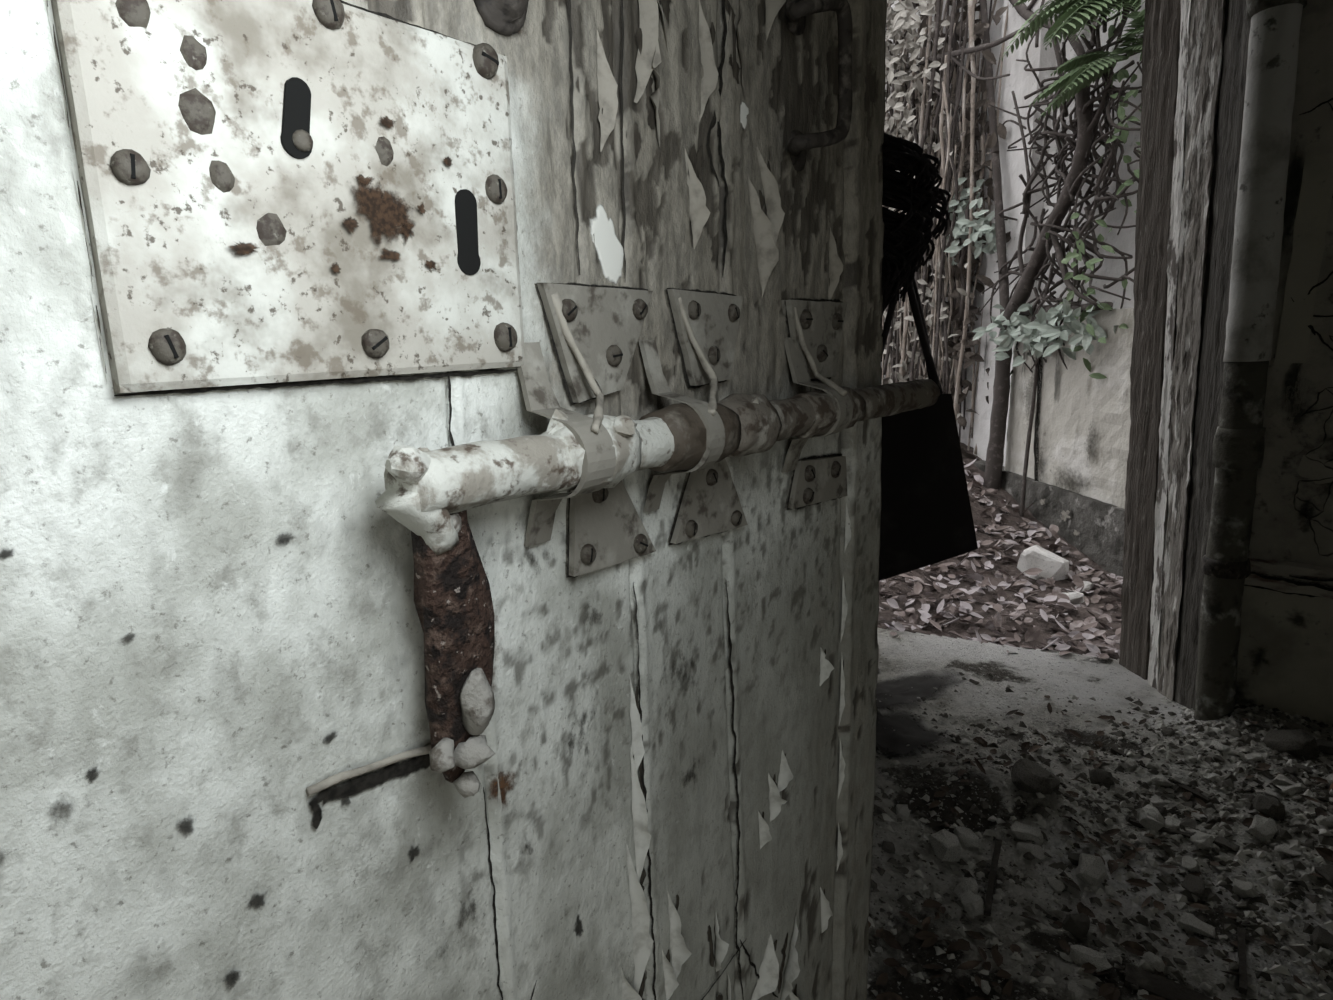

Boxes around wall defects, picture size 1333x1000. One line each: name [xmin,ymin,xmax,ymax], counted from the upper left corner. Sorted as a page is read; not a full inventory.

corrosion [380,116,396,128]
peeling [576,0,671,158]
peeling [698,0,749,129]
corrosion [229,242,259,256]
corrosion [343,175,426,261]
peeling [591,205,624,283]
peeling [685,144,710,249]
peeling [747,147,785,297]
crack [1291,271,1333,351]
crack [1244,387,1333,597]
peeling [621,675,692,1000]
peeling [751,918,800,1000]